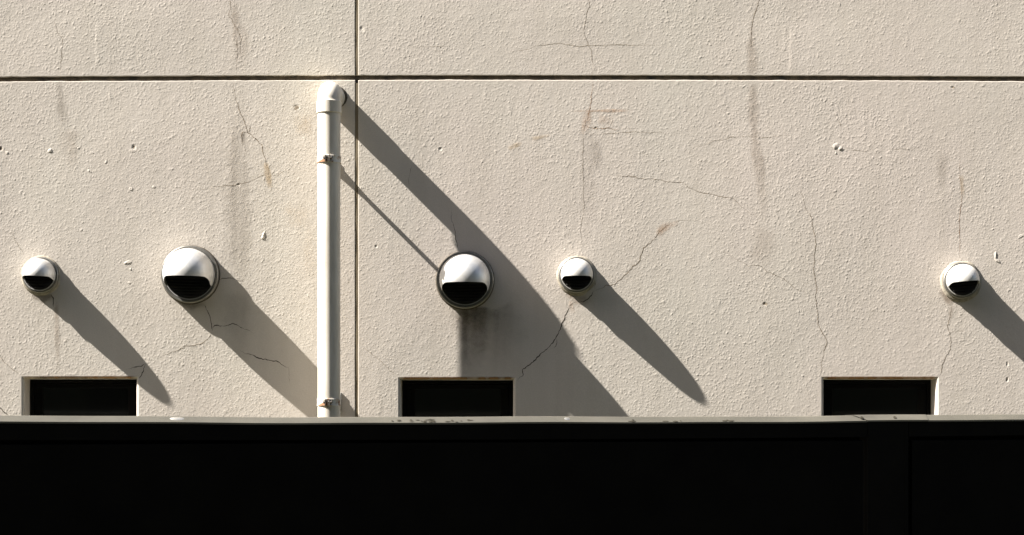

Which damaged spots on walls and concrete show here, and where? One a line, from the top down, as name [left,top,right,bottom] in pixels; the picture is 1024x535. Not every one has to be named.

crack [208,97,284,189]
crack [168,306,290,381]
crack [519,220,685,378]
crack [727,182,827,374]